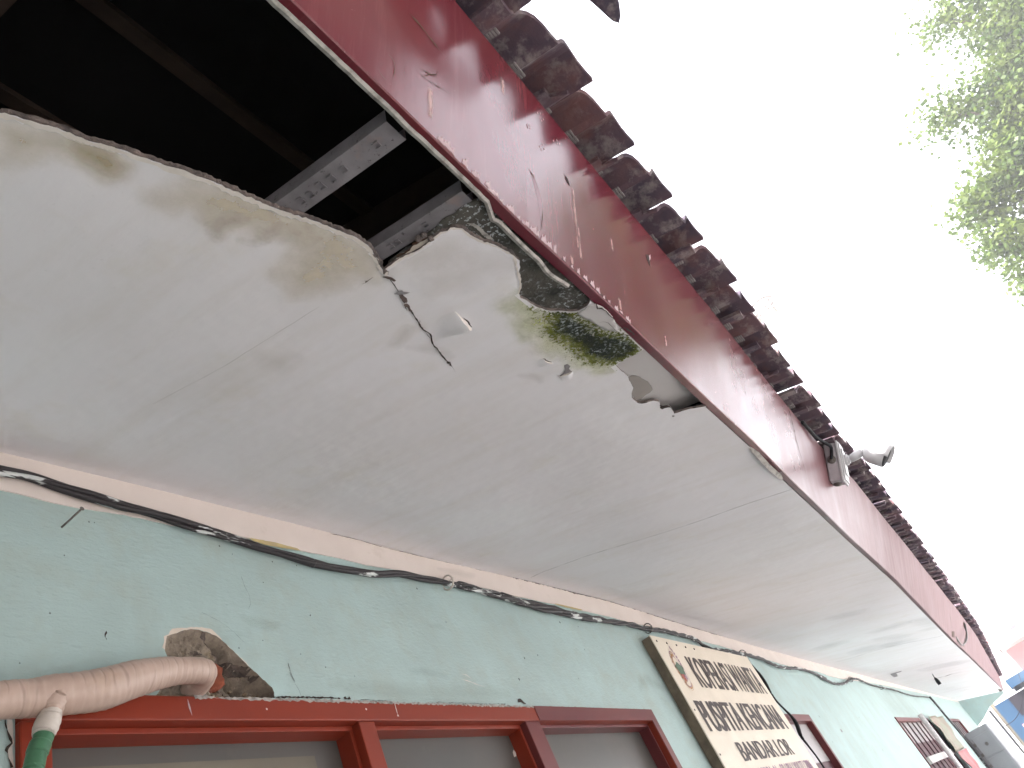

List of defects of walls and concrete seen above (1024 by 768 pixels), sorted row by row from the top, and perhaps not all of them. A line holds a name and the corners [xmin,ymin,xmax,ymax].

spalling [0,0,635,336]
crack [363,276,452,366]
peeling [617,350,700,417]
spalling [157,685,186,696]
spalling [162,627,275,698]